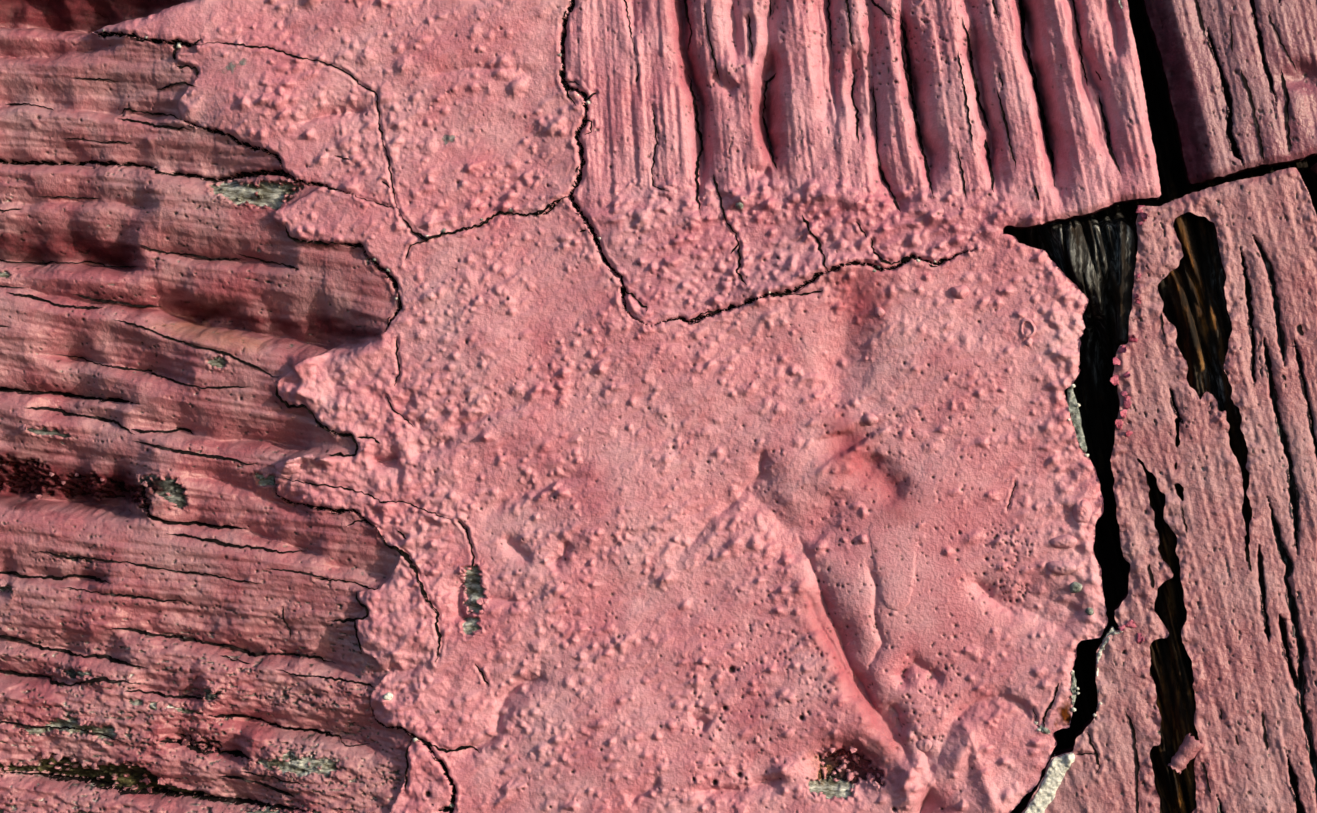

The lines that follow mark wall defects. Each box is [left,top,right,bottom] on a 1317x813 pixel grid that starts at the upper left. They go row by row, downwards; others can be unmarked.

peeling [209,177,304,210]
crack [0,0,977,426]
crack [275,387,475,662]
crack [370,701,480,813]
peeling [809,746,884,799]
peeling [1168,733,1204,774]